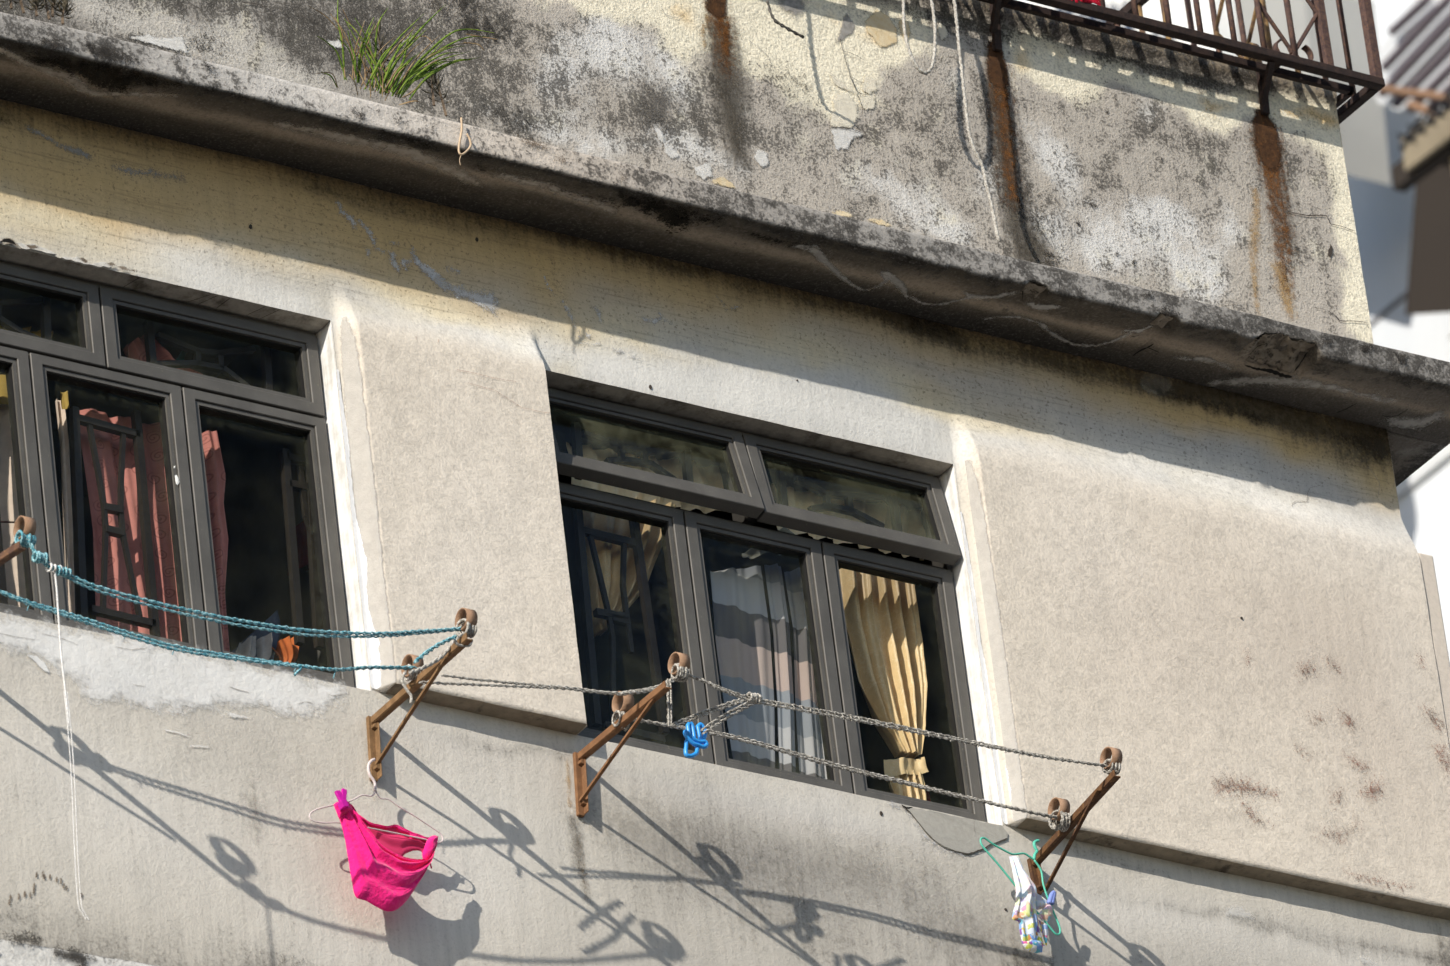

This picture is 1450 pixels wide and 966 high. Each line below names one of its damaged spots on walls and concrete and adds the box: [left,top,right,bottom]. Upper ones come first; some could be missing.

water stain [0,48,178,97]
water stain [176,20,226,65]
water stain [444,0,526,61]
rust [702,0,748,166]
water stain [1087,41,1243,95]
water stain [273,123,480,185]
rust [986,39,1047,265]
water stain [498,174,618,214]
rust [1251,107,1295,312]
water stain [335,202,498,317]
water stain [1211,768,1279,830]
water stain [1306,708,1385,844]